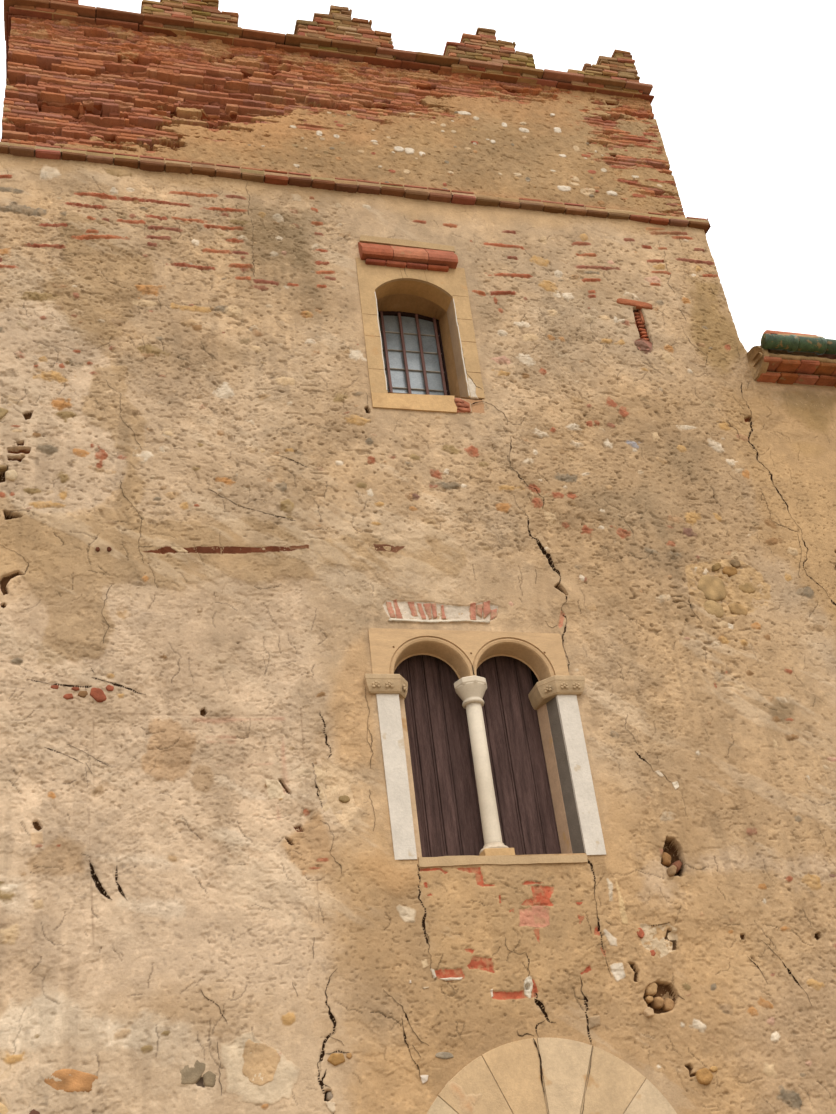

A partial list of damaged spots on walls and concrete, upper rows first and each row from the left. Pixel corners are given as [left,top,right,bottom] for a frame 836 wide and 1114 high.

spalling [38,102,102,119]
crack [453,302,570,672]
crack [726,384,836,605]
spalling [0,545,29,608]
spalling [661,839,683,877]
crack [383,989,428,1076]
crack [417,864,431,969]
crack [505,937,556,1114]
crack [582,993,601,1114]
crack [588,860,611,974]
spalling [629,963,685,1018]
flaking render [637,922,679,958]